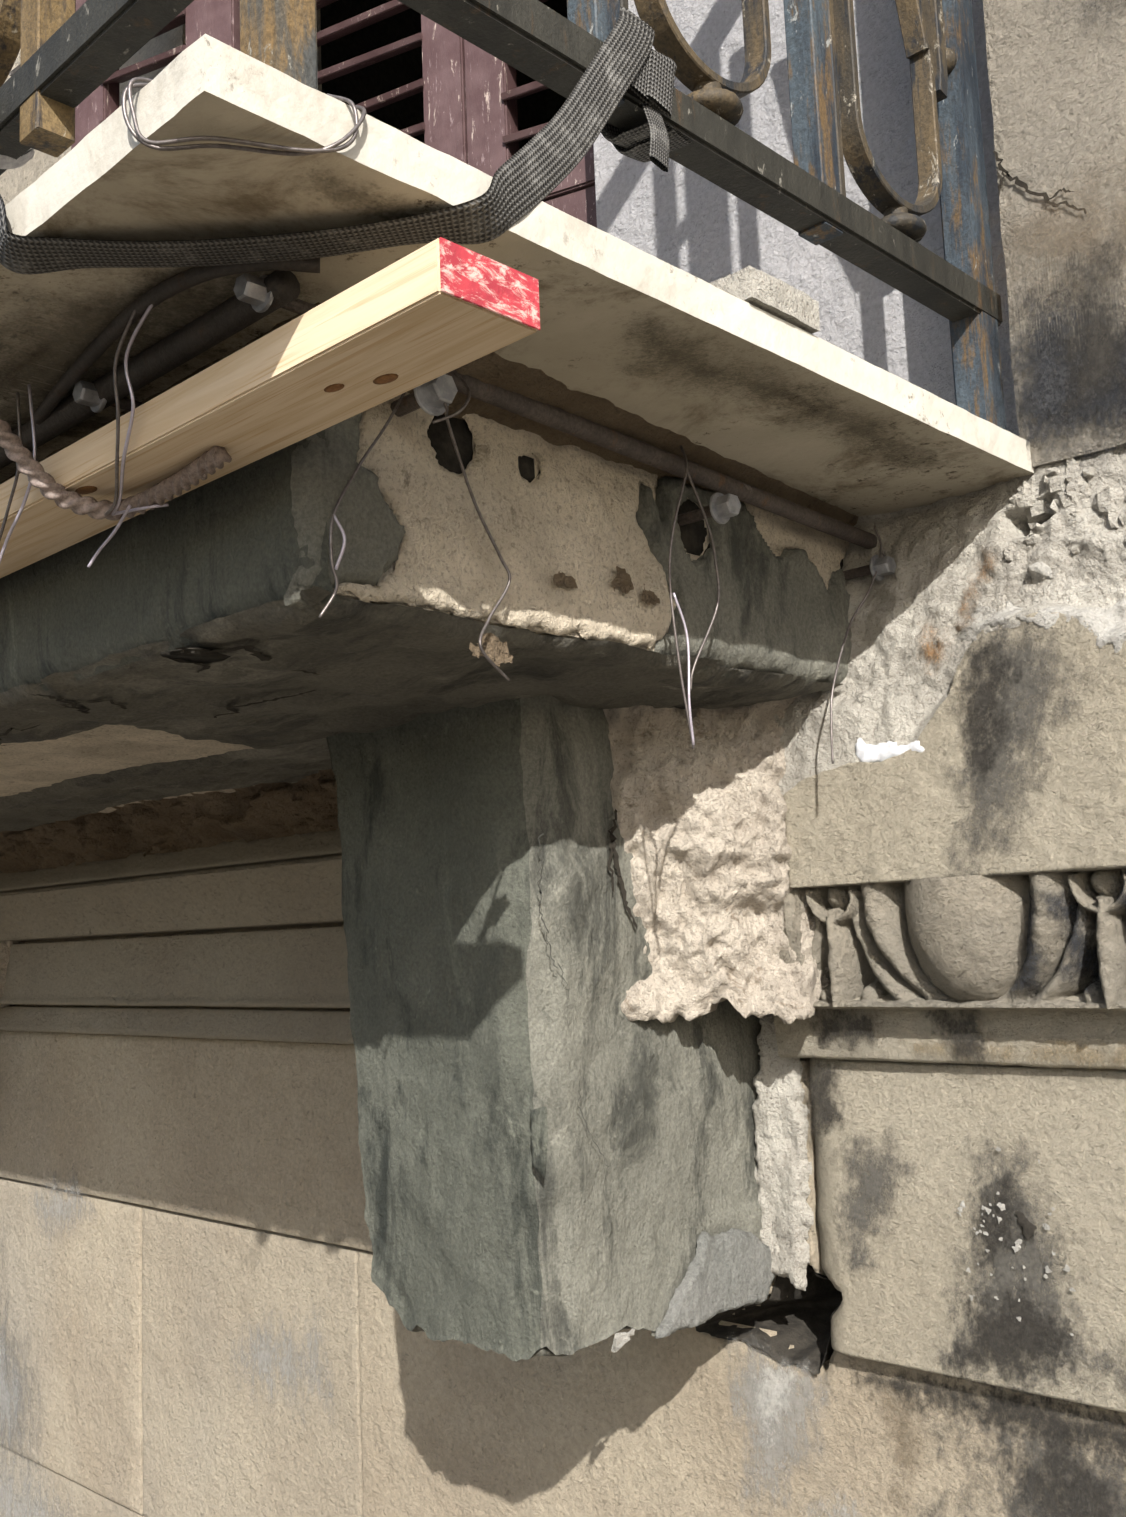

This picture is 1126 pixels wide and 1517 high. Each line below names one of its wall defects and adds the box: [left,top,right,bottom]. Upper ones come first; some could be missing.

crack [993,151,1087,214]
damp [1004,242,1126,454]
spalling [336,392,677,667]
spalling [744,502,849,590]
peeling [1028,562,1052,579]
peeling [957,598,1126,653]
spalling [0,724,252,797]
damp [949,620,1077,875]
spalling [0,769,339,873]
flaking render [603,695,843,1375]
damp [857,1143,1126,1517]